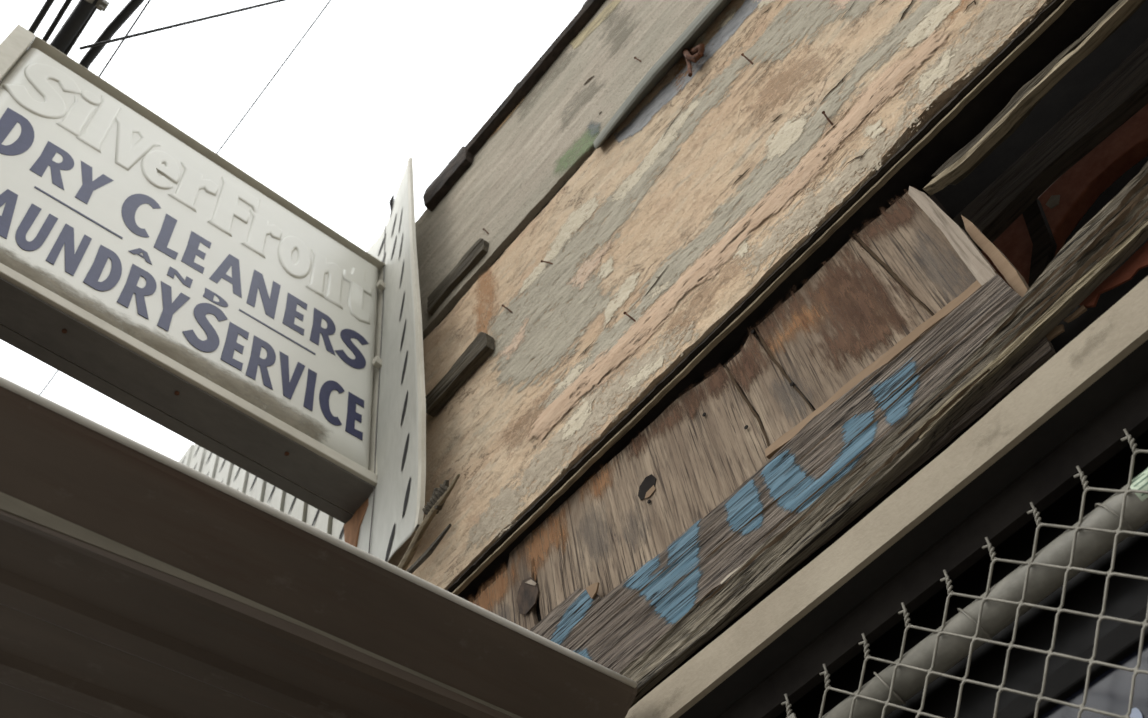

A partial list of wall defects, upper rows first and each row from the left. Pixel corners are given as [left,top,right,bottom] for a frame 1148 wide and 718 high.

peeling [466,0,1044,552]